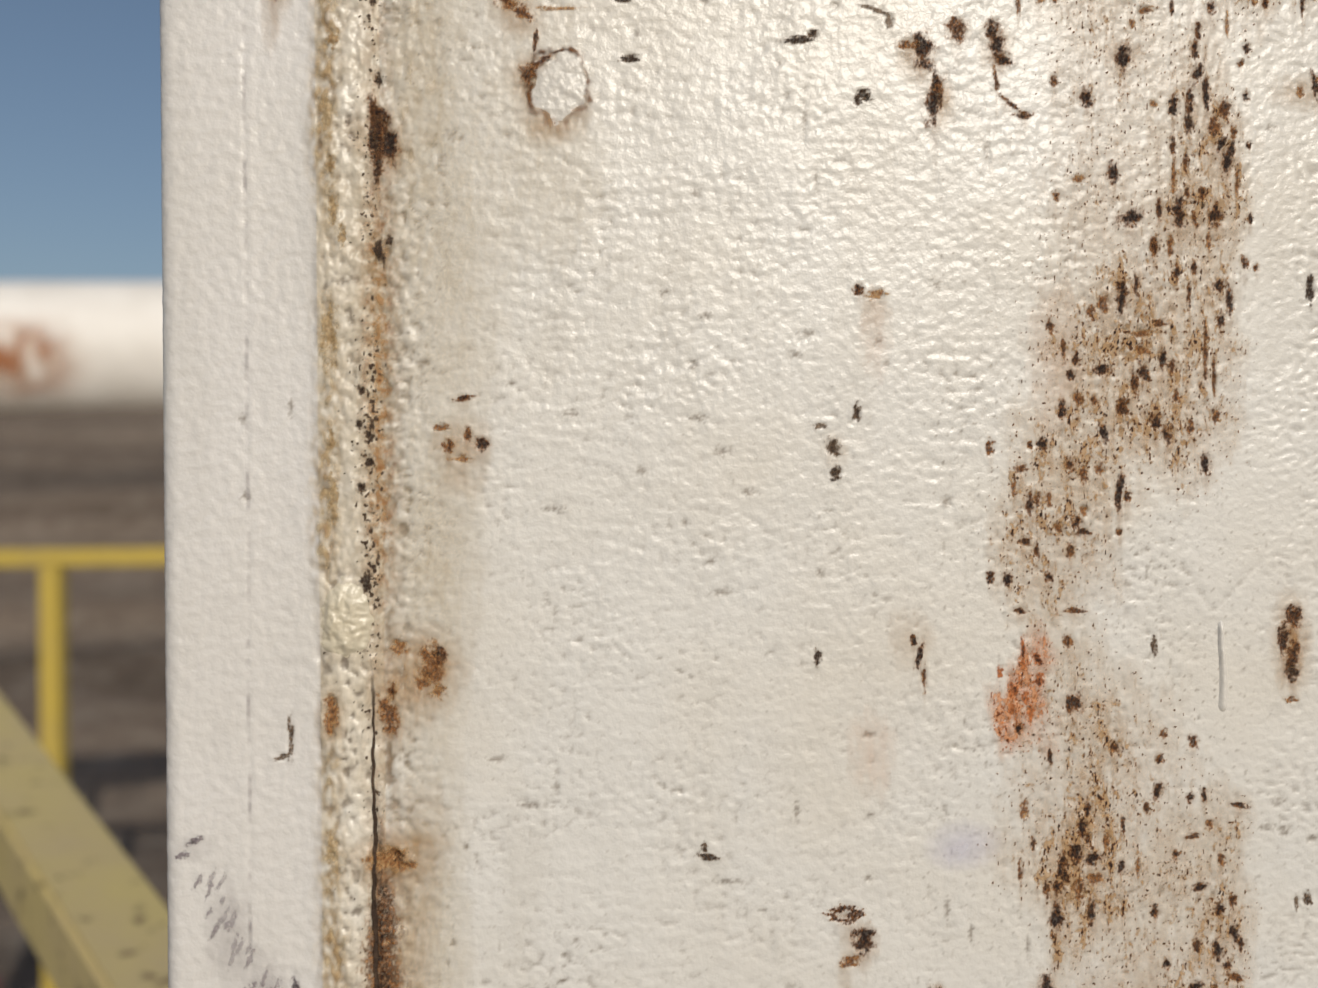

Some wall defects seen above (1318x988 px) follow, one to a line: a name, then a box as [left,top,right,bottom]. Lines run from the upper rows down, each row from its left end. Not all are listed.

corrosion [944,16,966,44]
corrosion [899,32,944,127]
corrosion [1297,73,1318,98]
corrosion [367,95,402,184]
corrosion [434,424,489,462]
corrosion [984,0,1274,988]
corrosion [323,696,339,735]
corrosion [377,638,448,734]
corrosion [1278,604,1303,703]
crack [365,691,402,988]
corrosion [362,844,418,875]